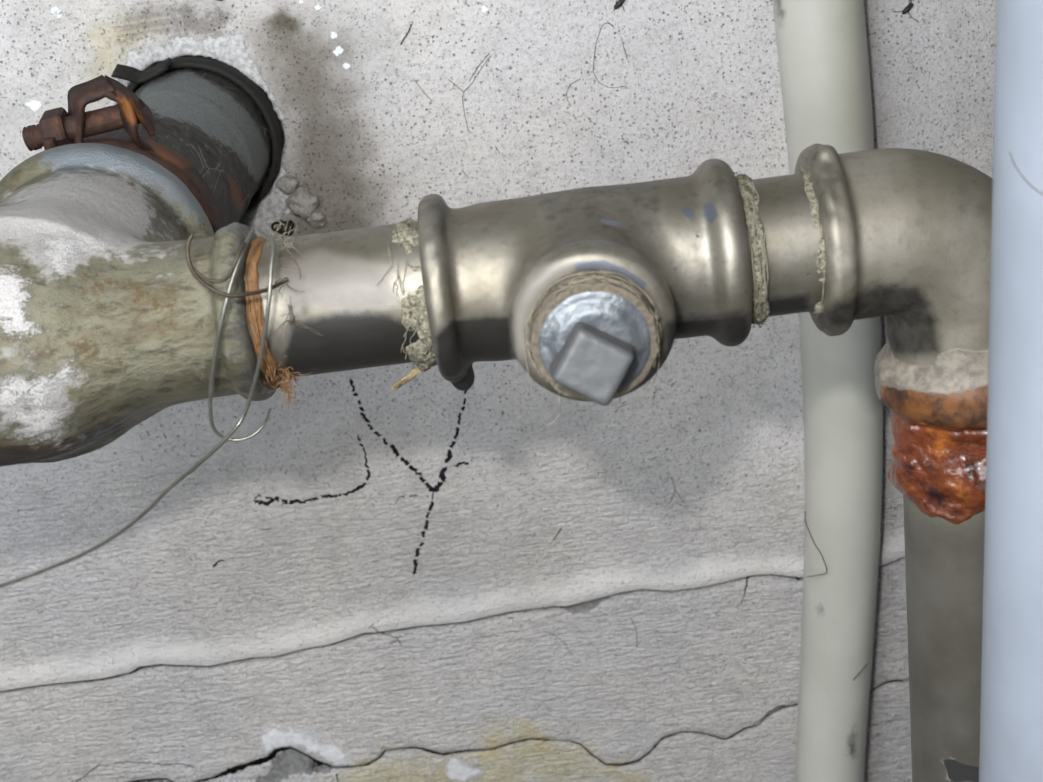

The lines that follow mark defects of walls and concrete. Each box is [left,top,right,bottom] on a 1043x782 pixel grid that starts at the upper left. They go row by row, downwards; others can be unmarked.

crack [590,574,801,604]
crack [2,606,566,692]
flaking render [256,748,334,782]
crack [71,704,798,782]